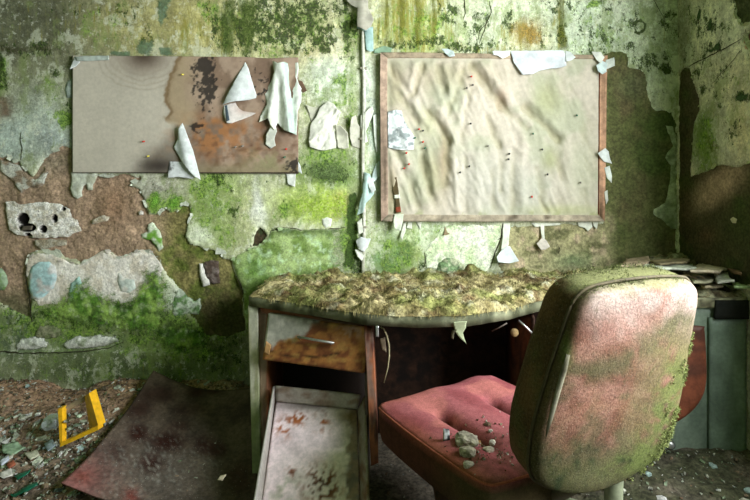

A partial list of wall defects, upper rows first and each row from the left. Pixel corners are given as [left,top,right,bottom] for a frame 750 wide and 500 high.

leakage [111,40,172,56]
leakage [158,0,170,26]
leakage [218,0,257,55]
spalling [497,52,750,286]
spalling [0,144,245,336]
spalling [250,226,267,247]